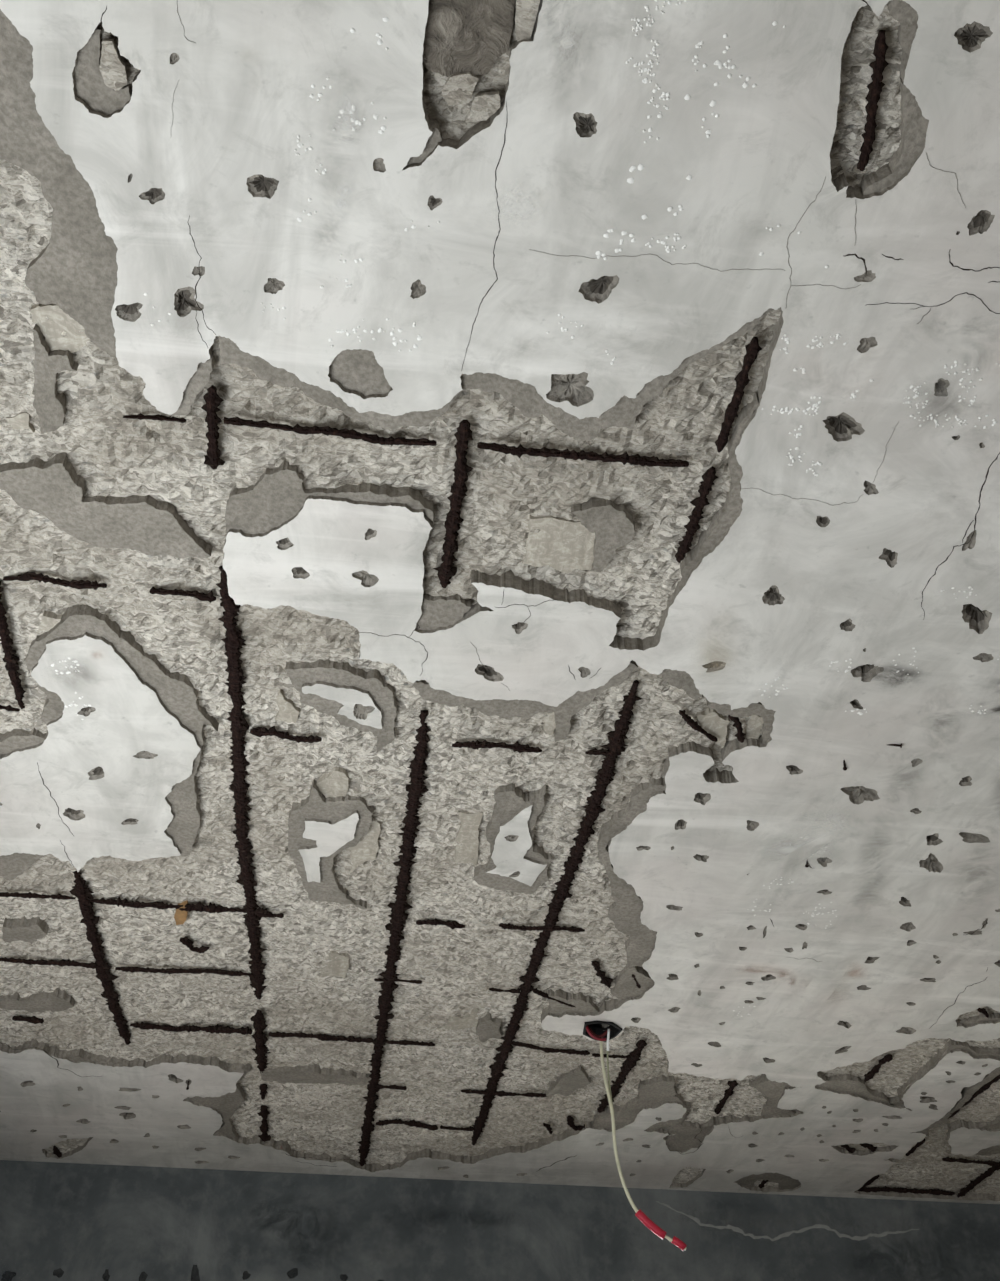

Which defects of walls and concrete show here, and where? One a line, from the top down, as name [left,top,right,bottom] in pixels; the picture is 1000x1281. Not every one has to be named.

spalling [830,0,929,199]
crack [462,104,507,367]
crack [529,177,1000,322]
rust [201,385,437,470]
spalling [0,0,804,1192]
crack [497,591,557,622]
rust [433,419,689,588]
rust [675,336,762,563]
flaking render [822,412,865,442]
crack [921,453,1000,620]
rust [0,566,647,1166]
spalling [815,1006,1000,1201]